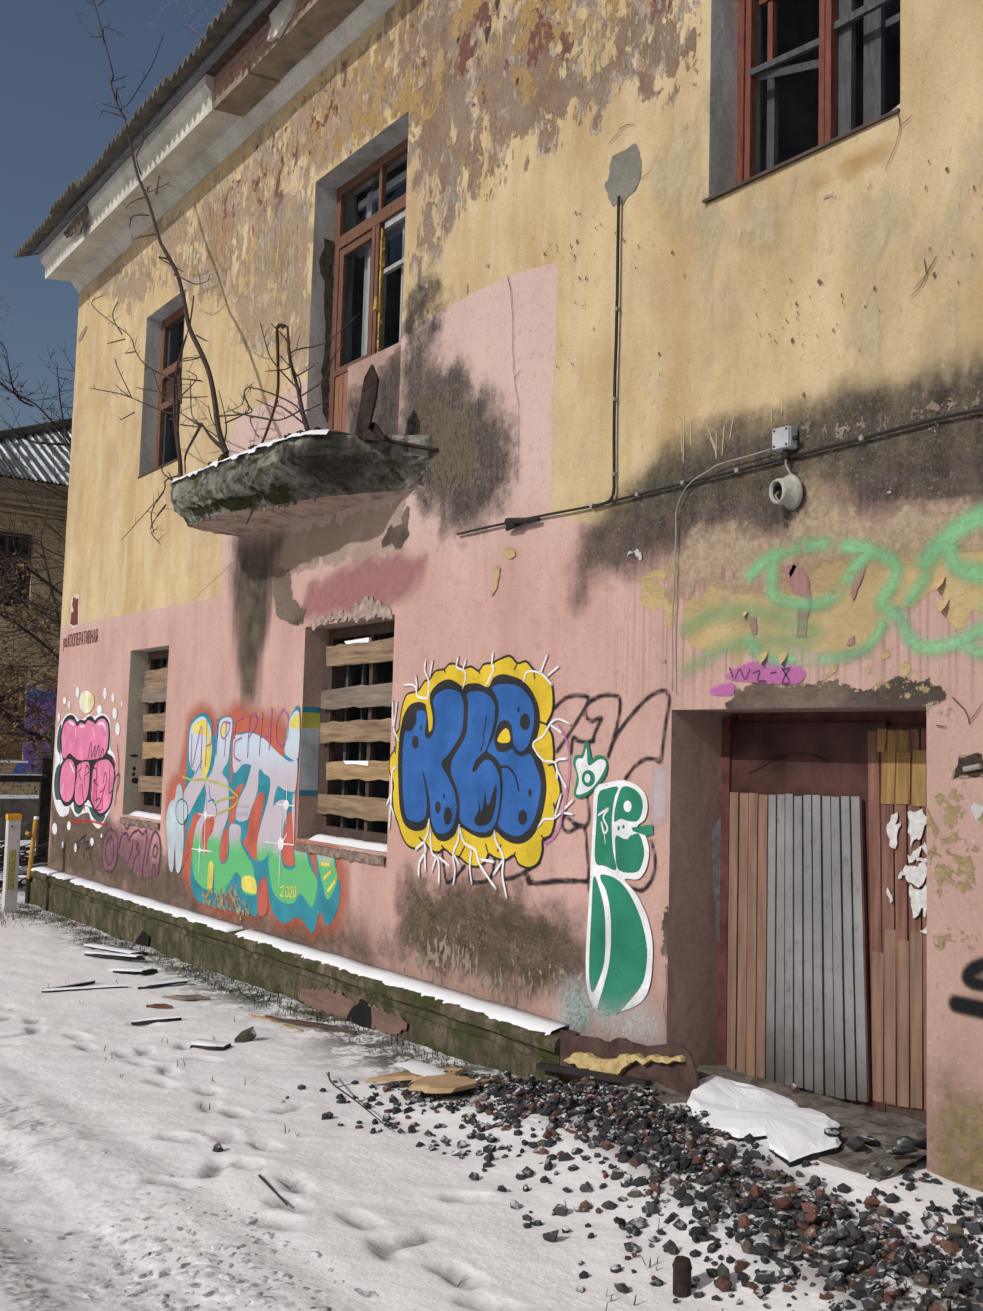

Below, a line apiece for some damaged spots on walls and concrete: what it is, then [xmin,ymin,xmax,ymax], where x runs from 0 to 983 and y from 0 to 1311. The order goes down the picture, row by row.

peeling [82,0,702,423]
water stain [183,484,296,524]
mould [292,279,511,530]
water stain [577,292,983,602]
water stain [234,538,281,700]
spalling [272,566,392,631]
peeling [627,541,983,717]
water stain [397,877,586,1016]